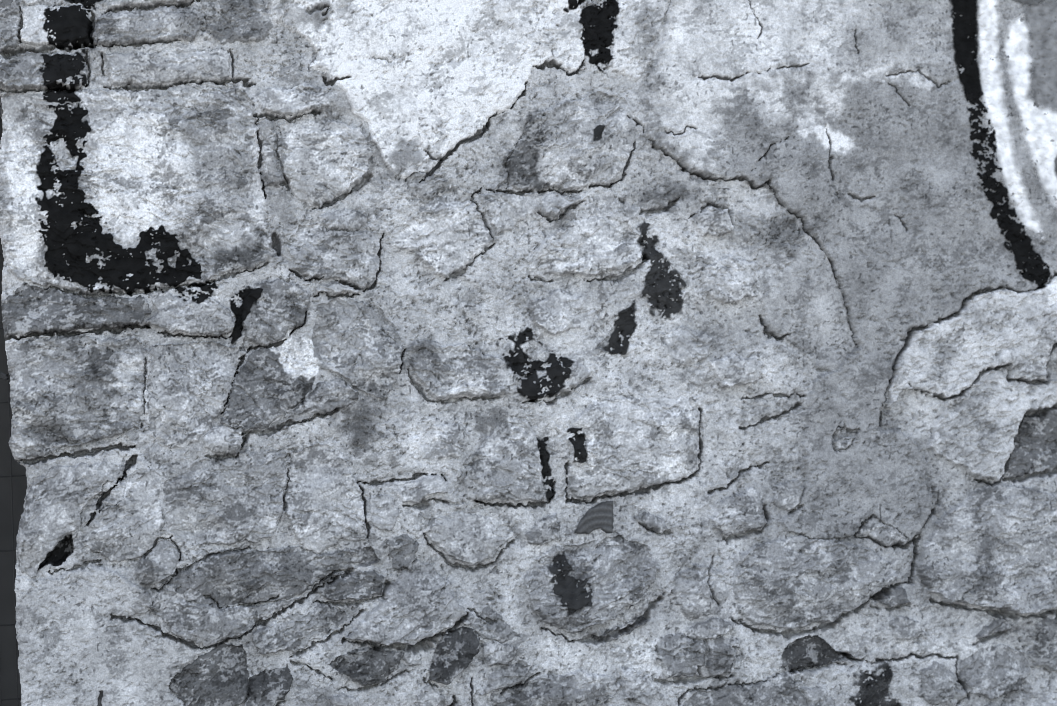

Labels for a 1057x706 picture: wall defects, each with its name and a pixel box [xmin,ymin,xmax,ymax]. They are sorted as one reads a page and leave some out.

crack [748,0,764,39]
crack [853,29,861,54]
crack [700,63,810,82]
crack [885,70,953,107]
crack [419,60,585,183]
crack [826,129,876,202]
crack [471,116,859,346]
crack [879,273,1057,487]
peeling [885,276,1057,482]
crack [739,392,807,431]
spalling [831,426,861,452]
spalling [39,534,75,570]